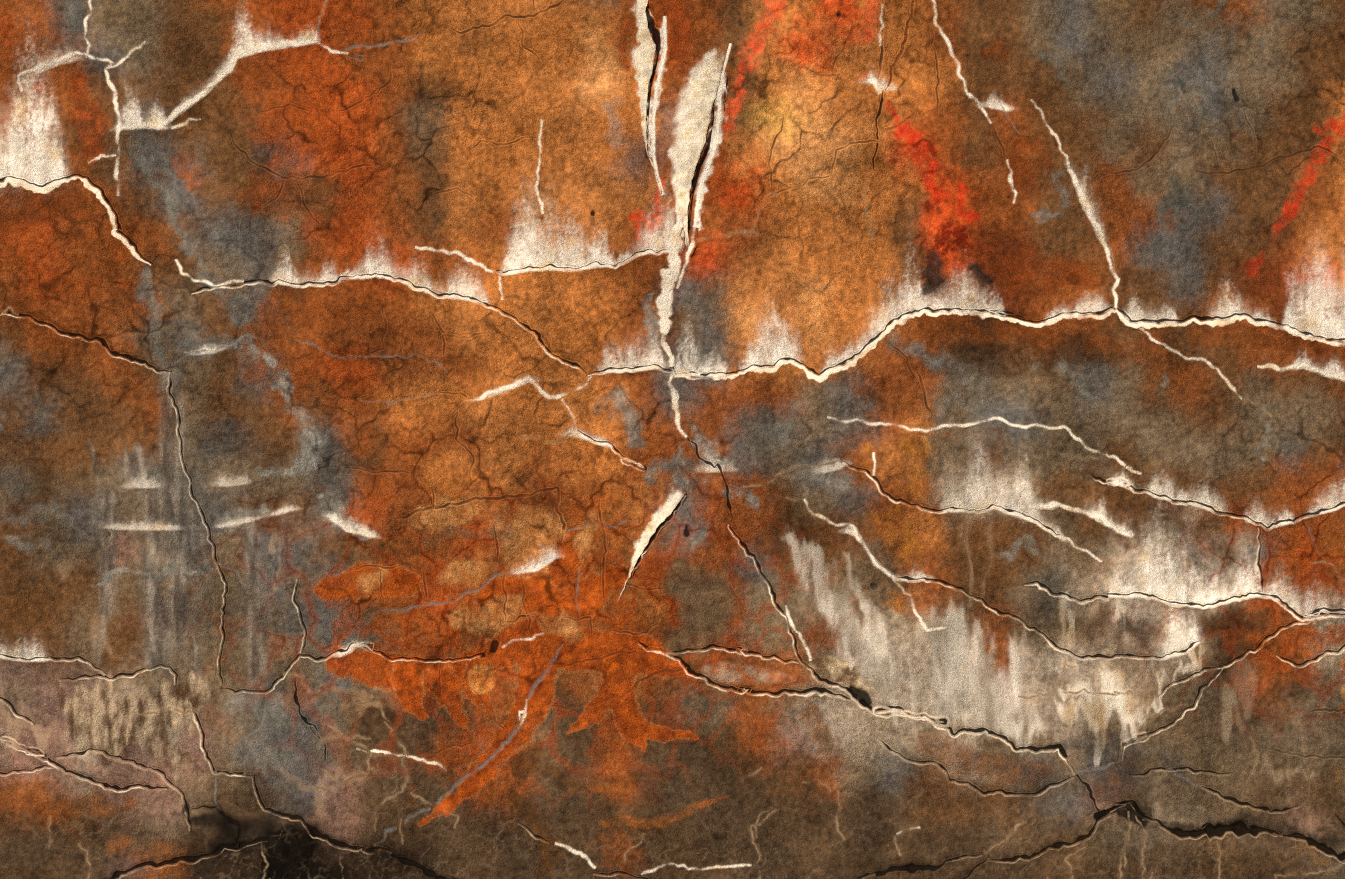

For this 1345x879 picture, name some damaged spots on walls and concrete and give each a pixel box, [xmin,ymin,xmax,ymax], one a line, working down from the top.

crack [0,0,422,266]
leakage [0,0,469,879]
crack [0,305,565,879]
rust [309,482,703,827]
leakage [260,0,766,305]
rust [586,779,730,833]
peeling [629,0,730,250]
peeling [615,486,749,668]
crack [174,0,1345,701]
leakage [552,186,1345,851]
crack [610,414,1345,879]
leakage [1029,133,1345,383]